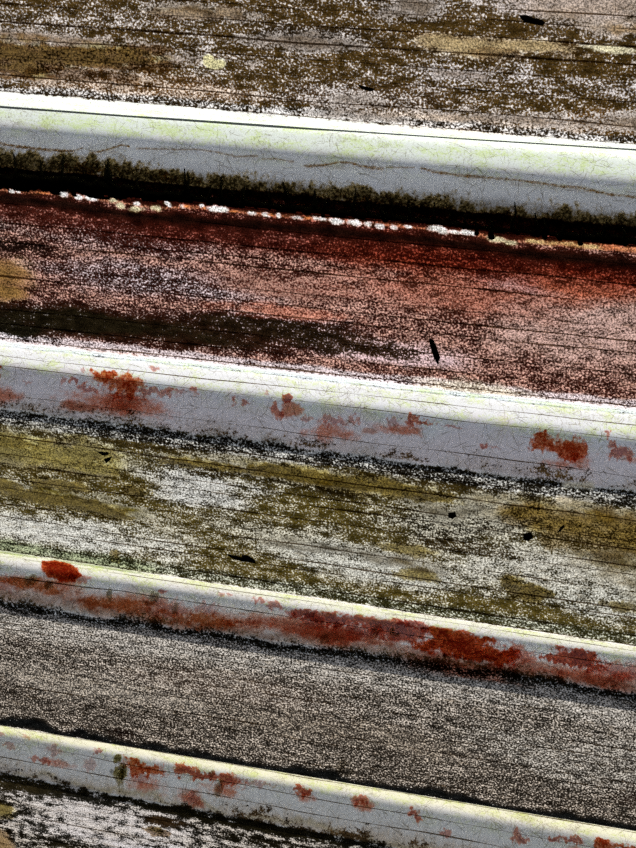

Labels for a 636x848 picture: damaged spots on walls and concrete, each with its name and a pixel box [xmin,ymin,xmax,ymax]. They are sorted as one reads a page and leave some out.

leakage [38,68,150,85]
corrosion [61,368,197,415]
corrosion [271,393,309,421]
corrosion [364,412,433,434]
corrosion [528,430,589,468]
corrosion [0,560,636,691]
corrosion [122,756,164,790]
corrosion [174,763,246,797]
corrosion [293,784,315,801]
corrosion [353,794,374,811]
corrosion [548,834,583,845]
corrosion [593,837,636,848]